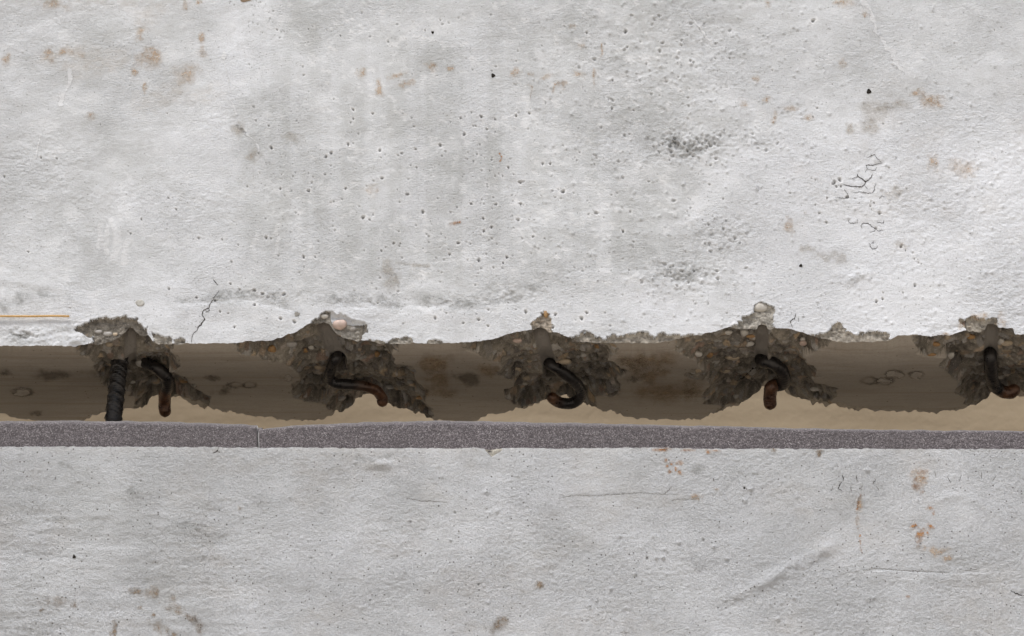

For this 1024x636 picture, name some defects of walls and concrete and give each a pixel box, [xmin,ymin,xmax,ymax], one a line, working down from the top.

crack [839,154,884,249]
spalling [75,315,211,408]
crack [191,279,219,341]
spalling [234,311,434,418]
spalling [460,302,890,413]
spalling [912,316,1024,406]